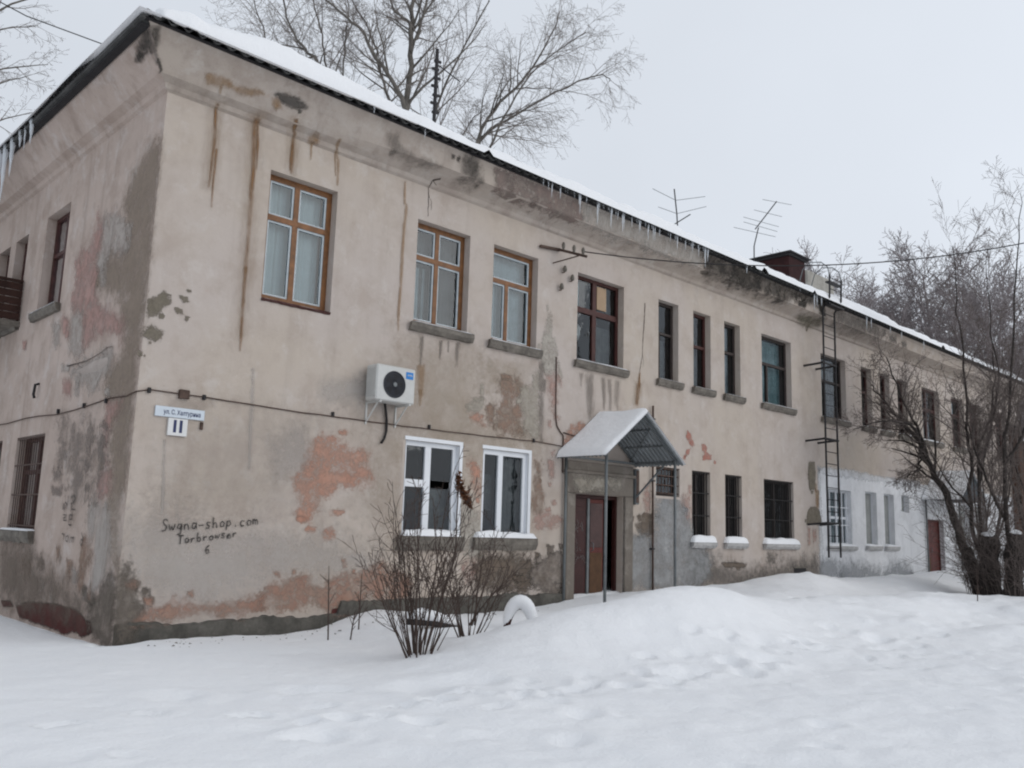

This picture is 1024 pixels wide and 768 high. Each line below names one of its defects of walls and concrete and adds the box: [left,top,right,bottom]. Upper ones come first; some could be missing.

rust [206,74,263,197]
rust [290,119,298,169]
damp [452,155,481,187]
flaking render [137,289,192,357]
damp [51,145,162,575]
peeling [466,374,527,438]
peeling [684,430,716,464]
peeling [295,430,373,539]
peeling [1,503,413,646]